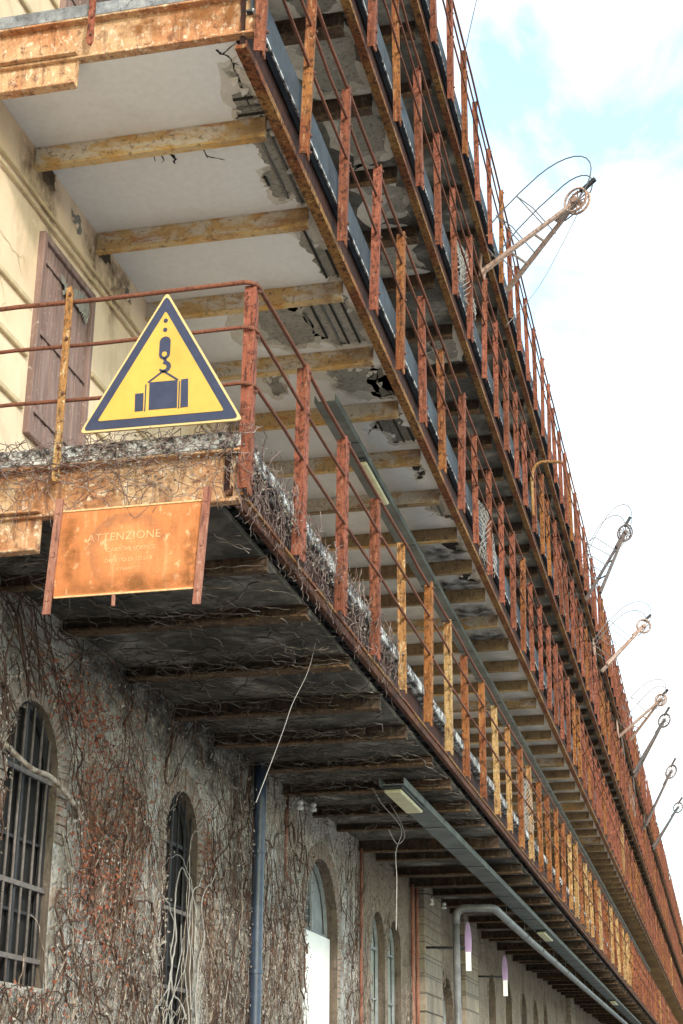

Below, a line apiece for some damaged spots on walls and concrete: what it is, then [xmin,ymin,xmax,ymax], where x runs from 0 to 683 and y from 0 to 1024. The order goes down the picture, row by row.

crack [216,42,240,75]
flaking render [217,56,374,354]
flaking render [256,375,290,401]
flaking render [312,364,419,448]